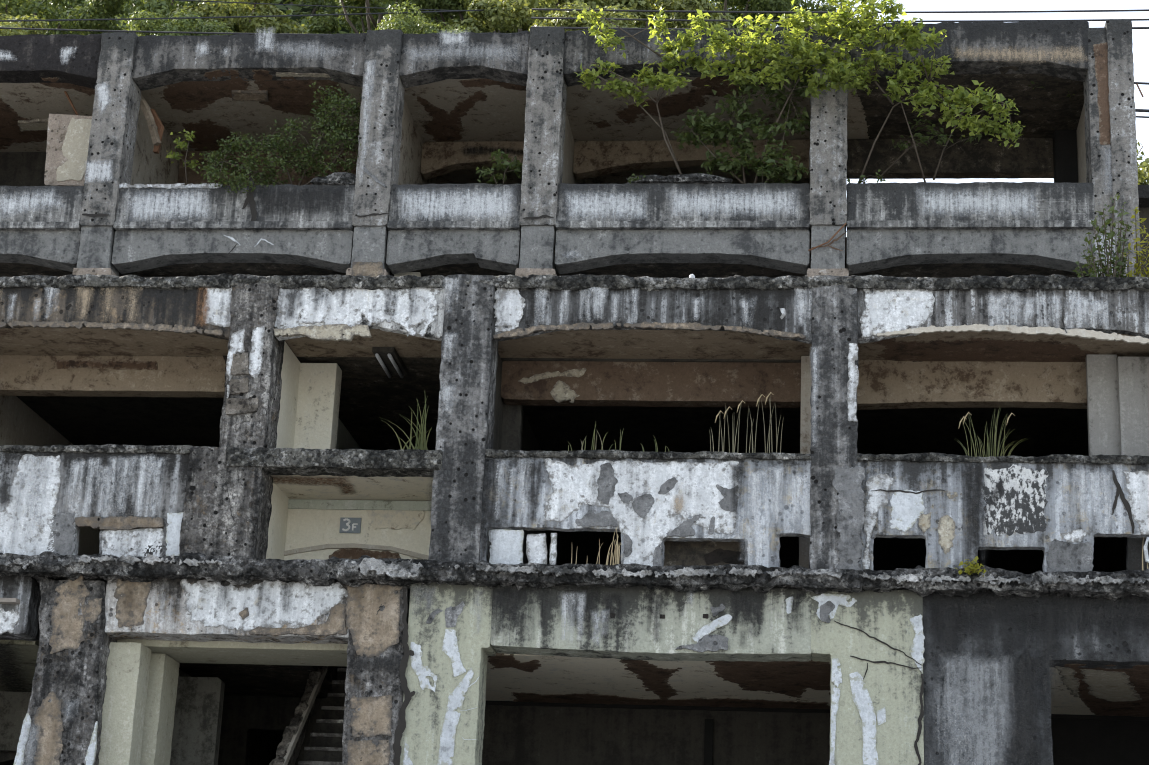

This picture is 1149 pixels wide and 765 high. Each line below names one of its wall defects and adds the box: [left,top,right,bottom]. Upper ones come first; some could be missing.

peeling [205,261,442,415]
water stain [0,478,22,505]
spalling [13,691,64,765]
water stain [71,458,161,514]
peeling [0,454,437,692]
peeling [513,604,886,765]
peeling [442,458,1149,586]
peeling [811,593,857,623]
crack [834,621,924,765]
peeling [910,614,925,674]
water stain [939,598,1149,765]
crack [1111,470,1135,534]